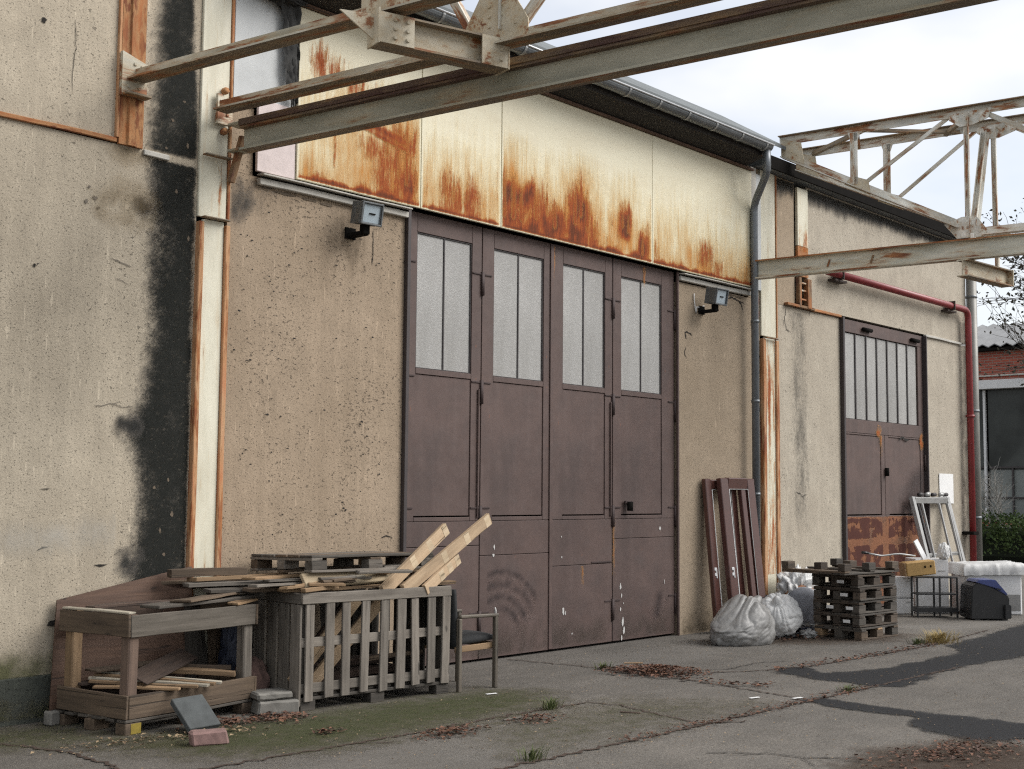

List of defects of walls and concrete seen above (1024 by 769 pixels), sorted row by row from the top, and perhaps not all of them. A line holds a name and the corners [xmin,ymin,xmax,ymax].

rust [299,119,751,286]